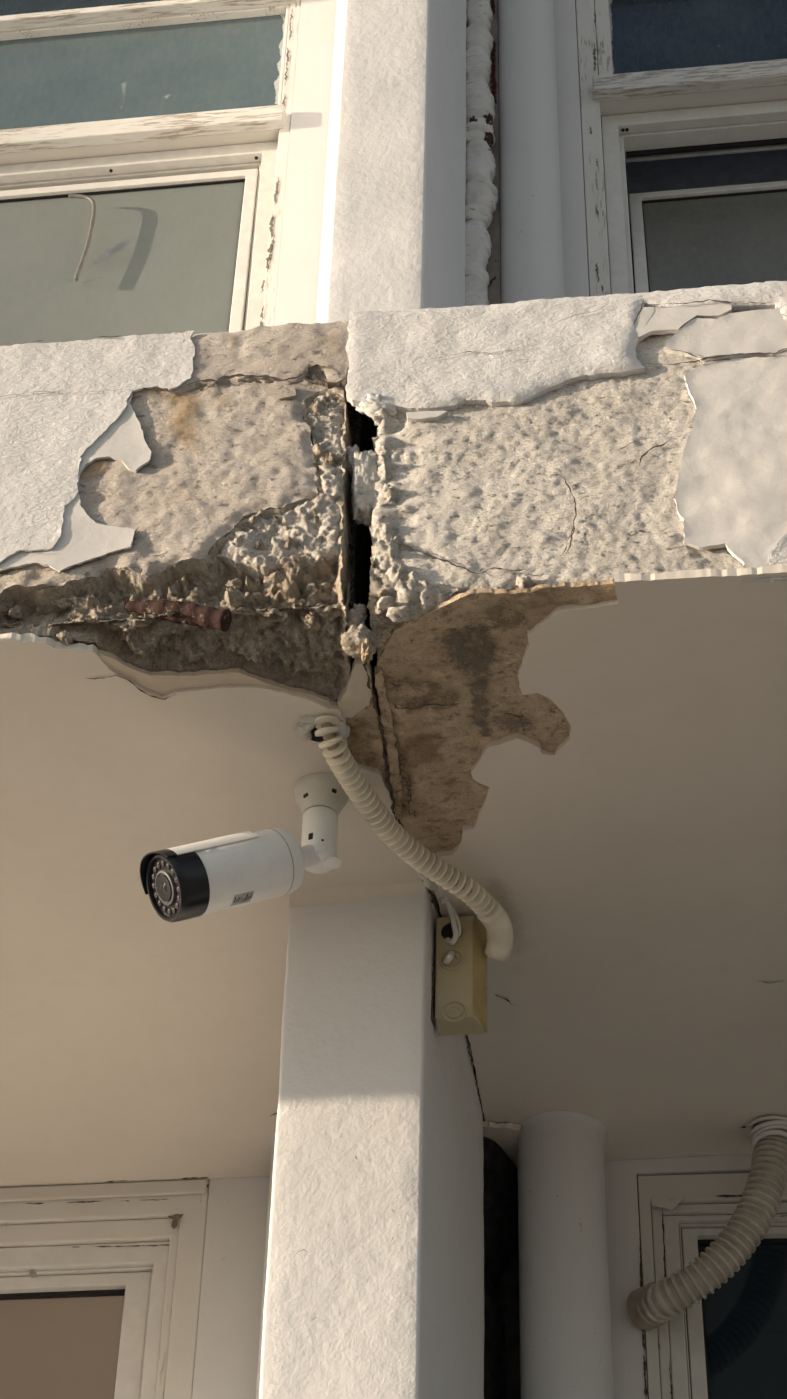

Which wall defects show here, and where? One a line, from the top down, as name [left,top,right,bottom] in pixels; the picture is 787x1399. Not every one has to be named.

peeling [282,8,293,106]
flaking render [0,178,743,853]
damp [396,606,530,737]